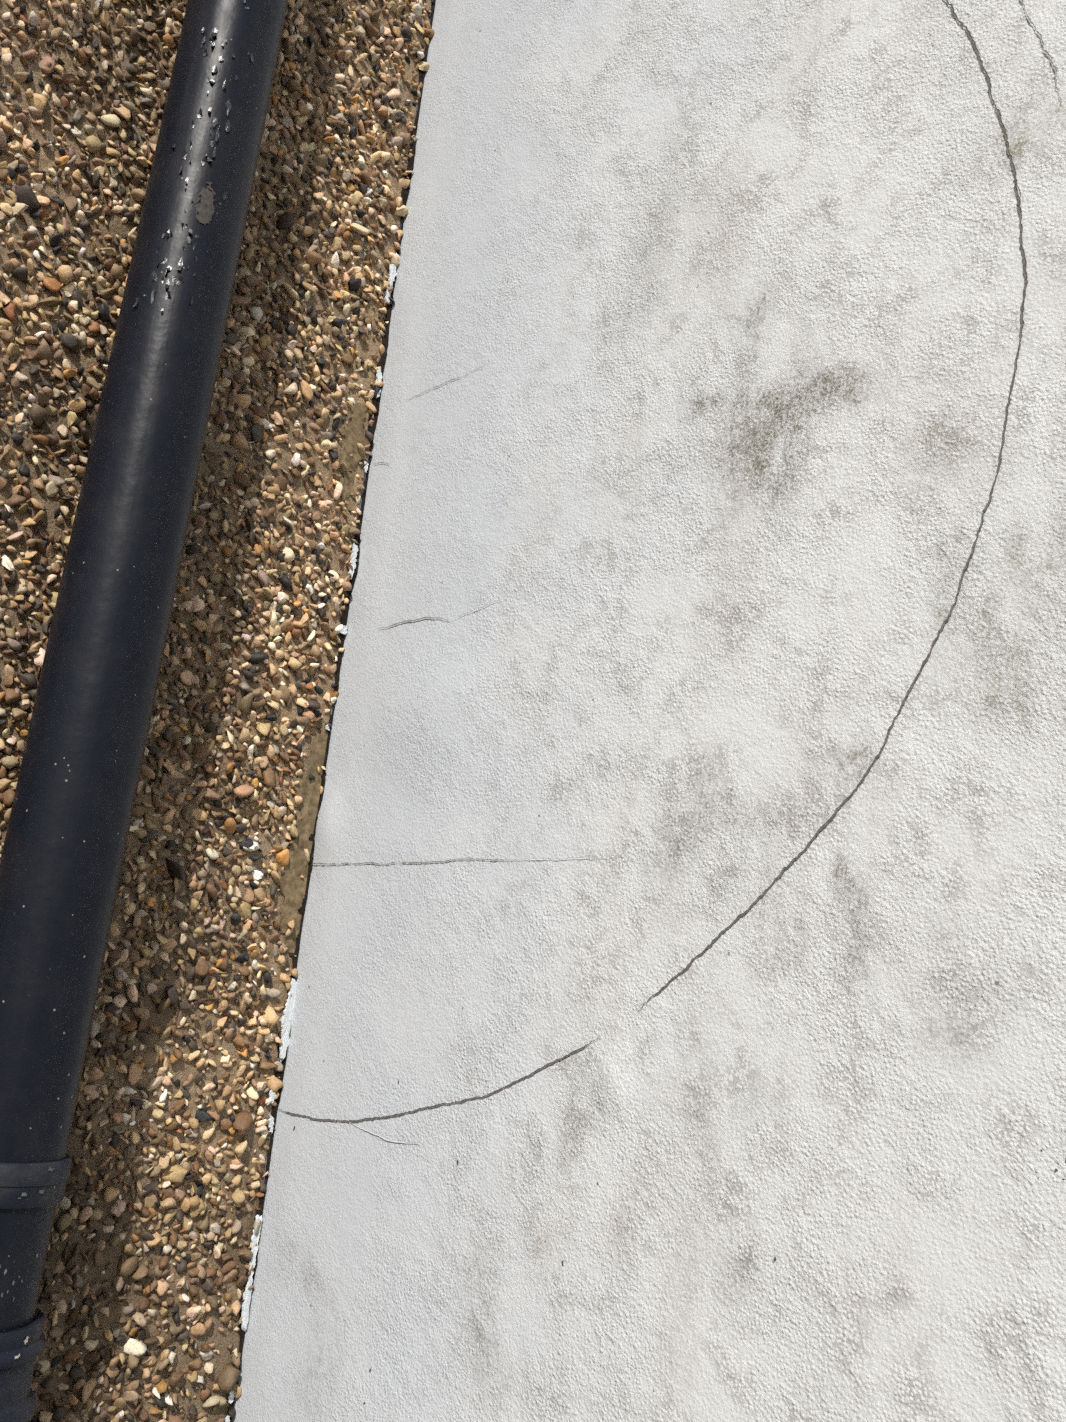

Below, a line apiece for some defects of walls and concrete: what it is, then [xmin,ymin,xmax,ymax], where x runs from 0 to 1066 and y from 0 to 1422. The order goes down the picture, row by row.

crack [288,0,614,993]
crack [640,0,1028,1009]
crack [1020,0,1062,103]
crack [227,1028,600,1422]